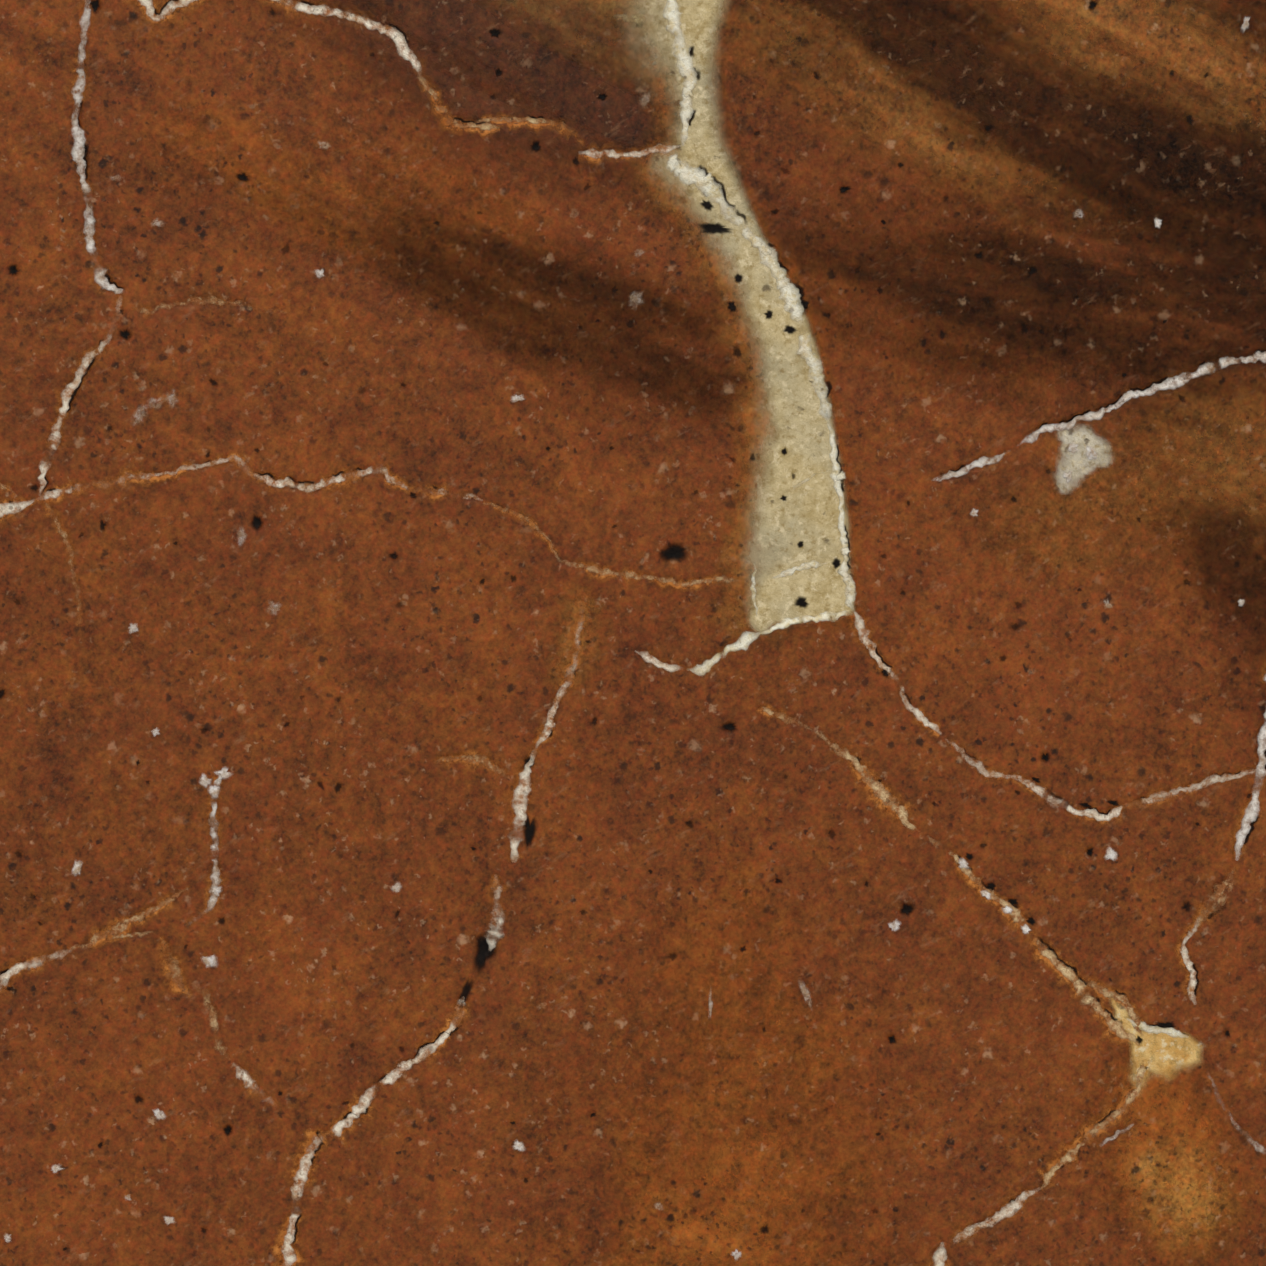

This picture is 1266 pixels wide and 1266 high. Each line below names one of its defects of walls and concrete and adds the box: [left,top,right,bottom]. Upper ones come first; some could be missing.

crack [72,0,240,314]
crack [266,0,678,163]
spalling [634,0,855,634]
spalling [1058,427,1110,492]
crack [938,349,1266,480]
crack [640,632,757,675]
crack [850,612,940,737]
crack [0,340,725,1266]
crack [831,744,915,829]
crack [965,676,1266,1000]
crack [928,852,1146,1266]
spalling [1112,999,1202,1085]